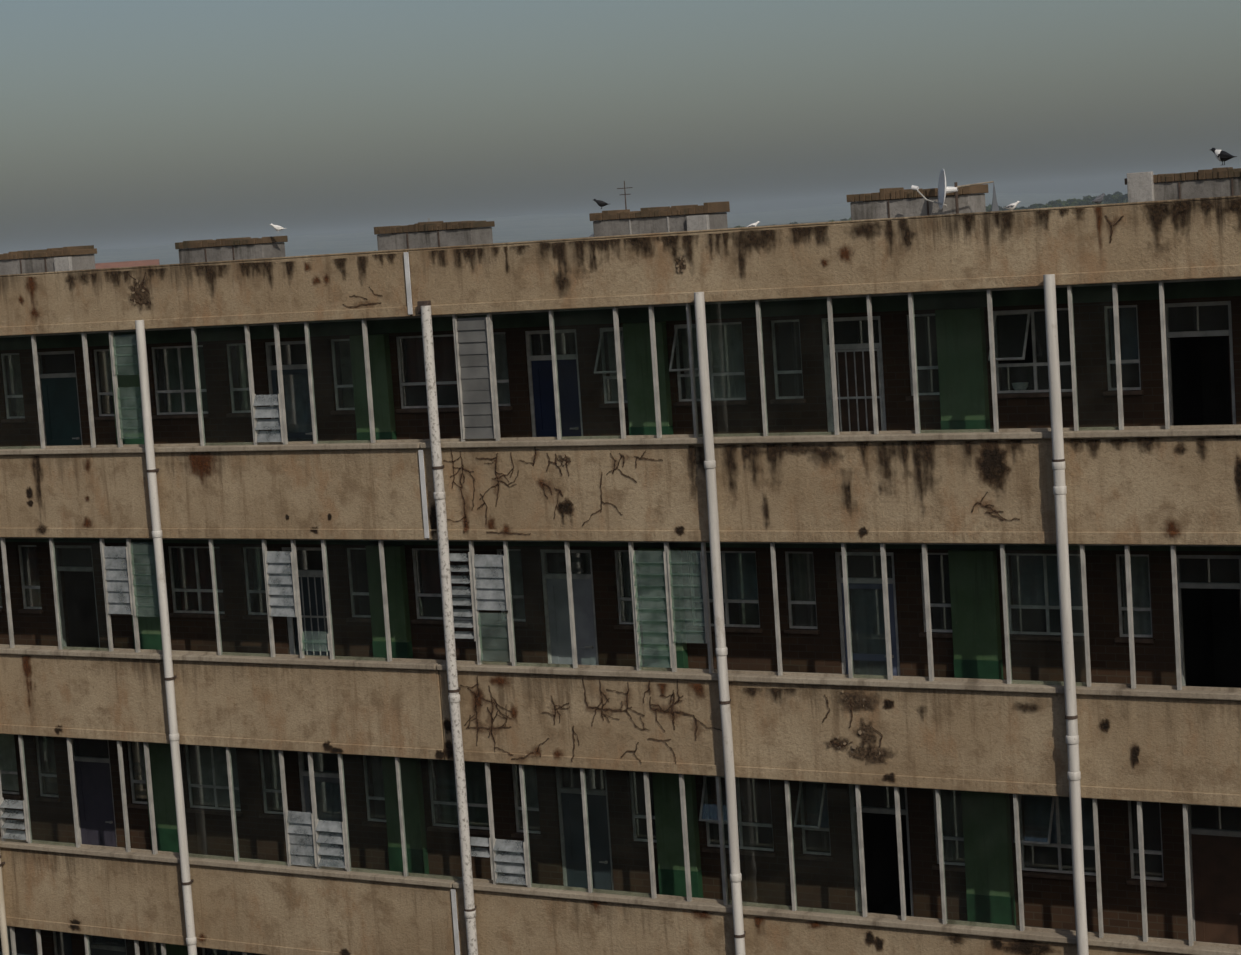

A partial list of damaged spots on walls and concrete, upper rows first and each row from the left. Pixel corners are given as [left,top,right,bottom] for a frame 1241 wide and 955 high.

damp [432,236,658,291]
damp [708,230,776,276]
damp [852,219,914,246]
damp [1146,198,1241,241]
crack [343,287,382,308]
corrosion [190,453,214,478]
crack [443,447,663,533]
damp [725,443,837,489]
damp [858,441,935,499]
crack [971,491,1020,521]
damp [1070,437,1158,454]
crack [460,676,722,764]